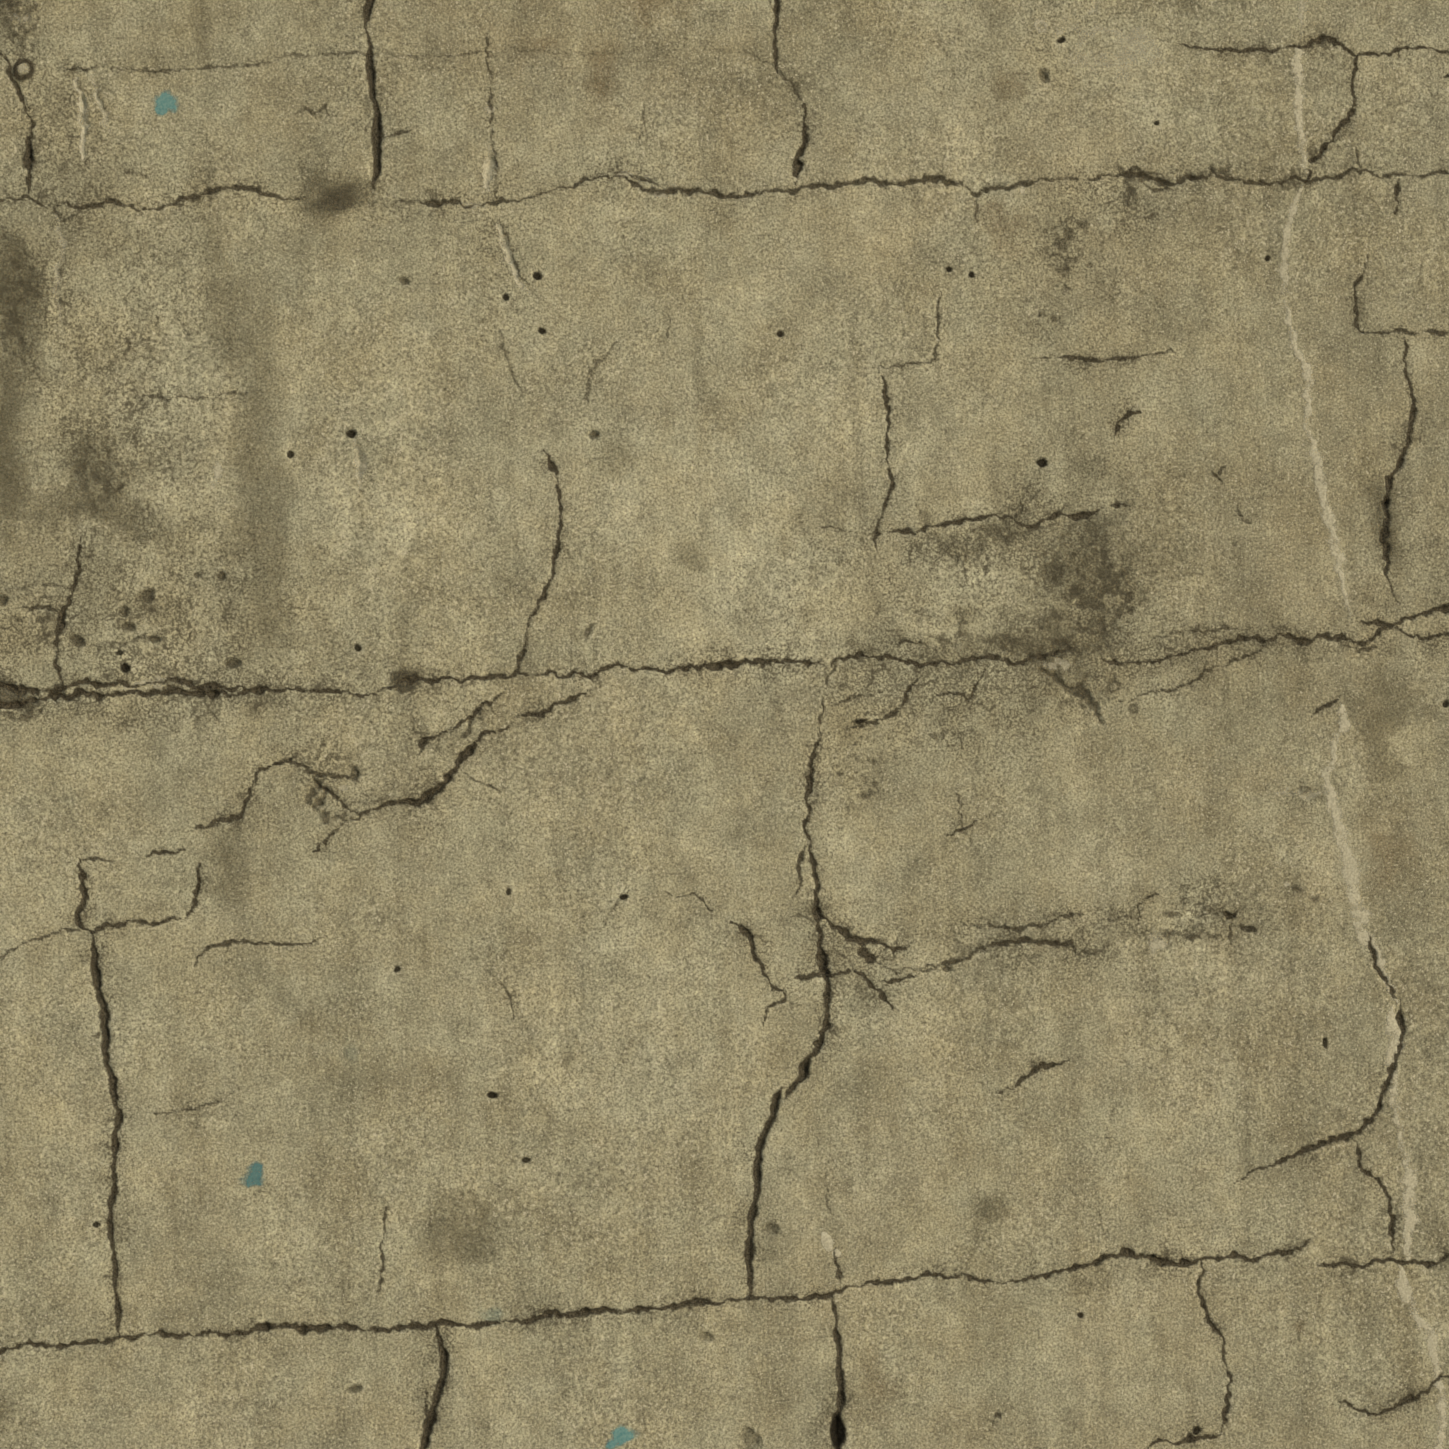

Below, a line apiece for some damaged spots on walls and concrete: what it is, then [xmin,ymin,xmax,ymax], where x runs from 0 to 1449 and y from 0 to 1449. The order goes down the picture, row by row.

crack [0,53,305,212]
crack [297,104,330,116]
crack [363,0,1449,219]
crack [821,291,1128,550]
crack [1041,348,1174,363]
crack [1102,254,1449,702]
water stain [1278,47,1350,611]
crack [0,449,1449,1449]
water stain [1321,704,1447,1449]